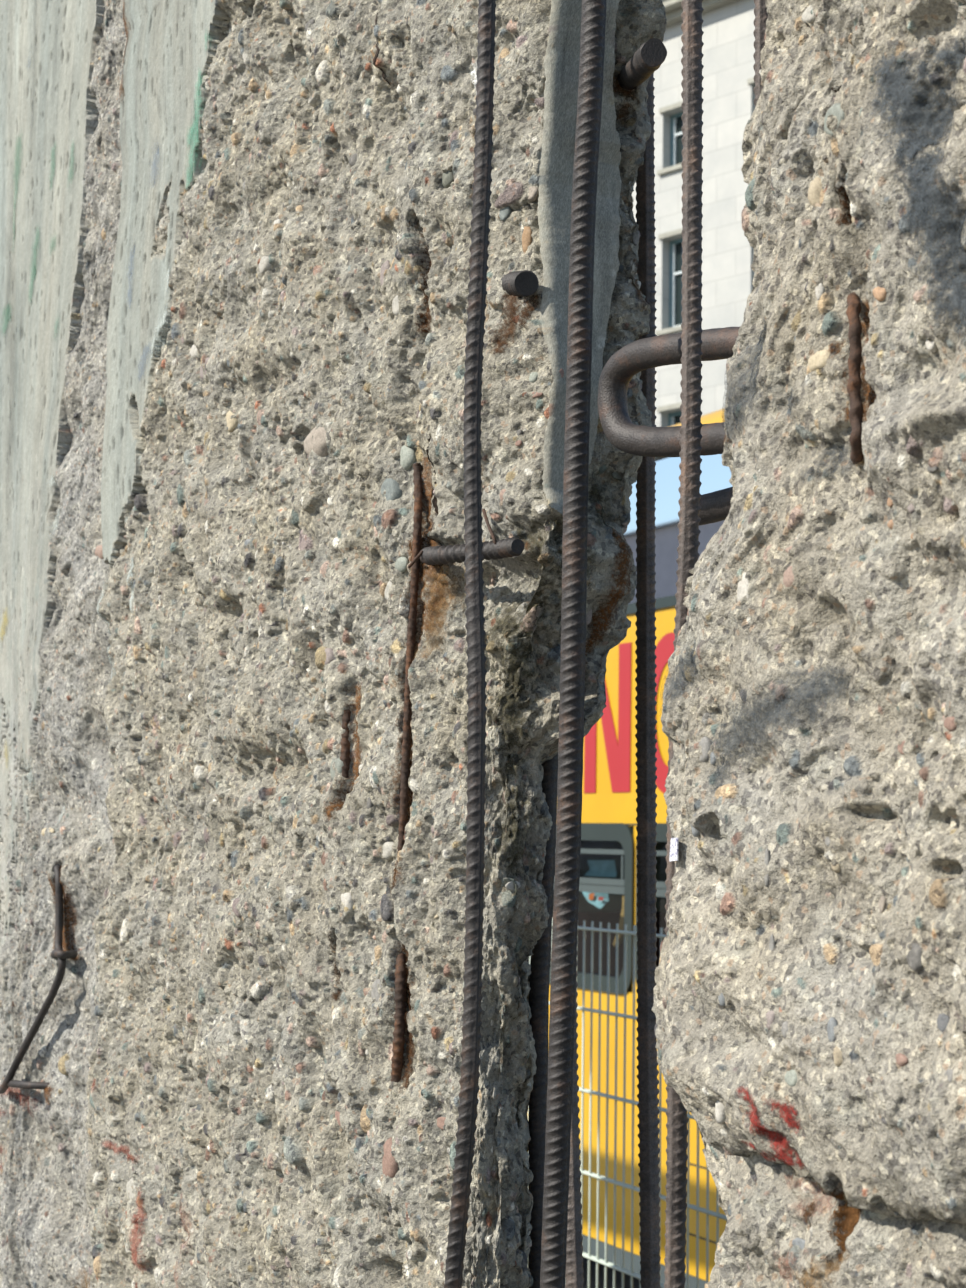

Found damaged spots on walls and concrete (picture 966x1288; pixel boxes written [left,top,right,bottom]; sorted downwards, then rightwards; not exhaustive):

damp [919,37,966,73]
damp [892,129,966,341]
rust [488,293,542,354]
spalling [673,0,704,651]
rust [828,299,876,422]
spalling [0,0,689,1288]
rust [390,457,457,820]
rust [324,683,361,820]
spalling [694,808,725,849]
rust [48,870,81,961]
rust [390,947,415,1091]
rust [799,1190,861,1288]